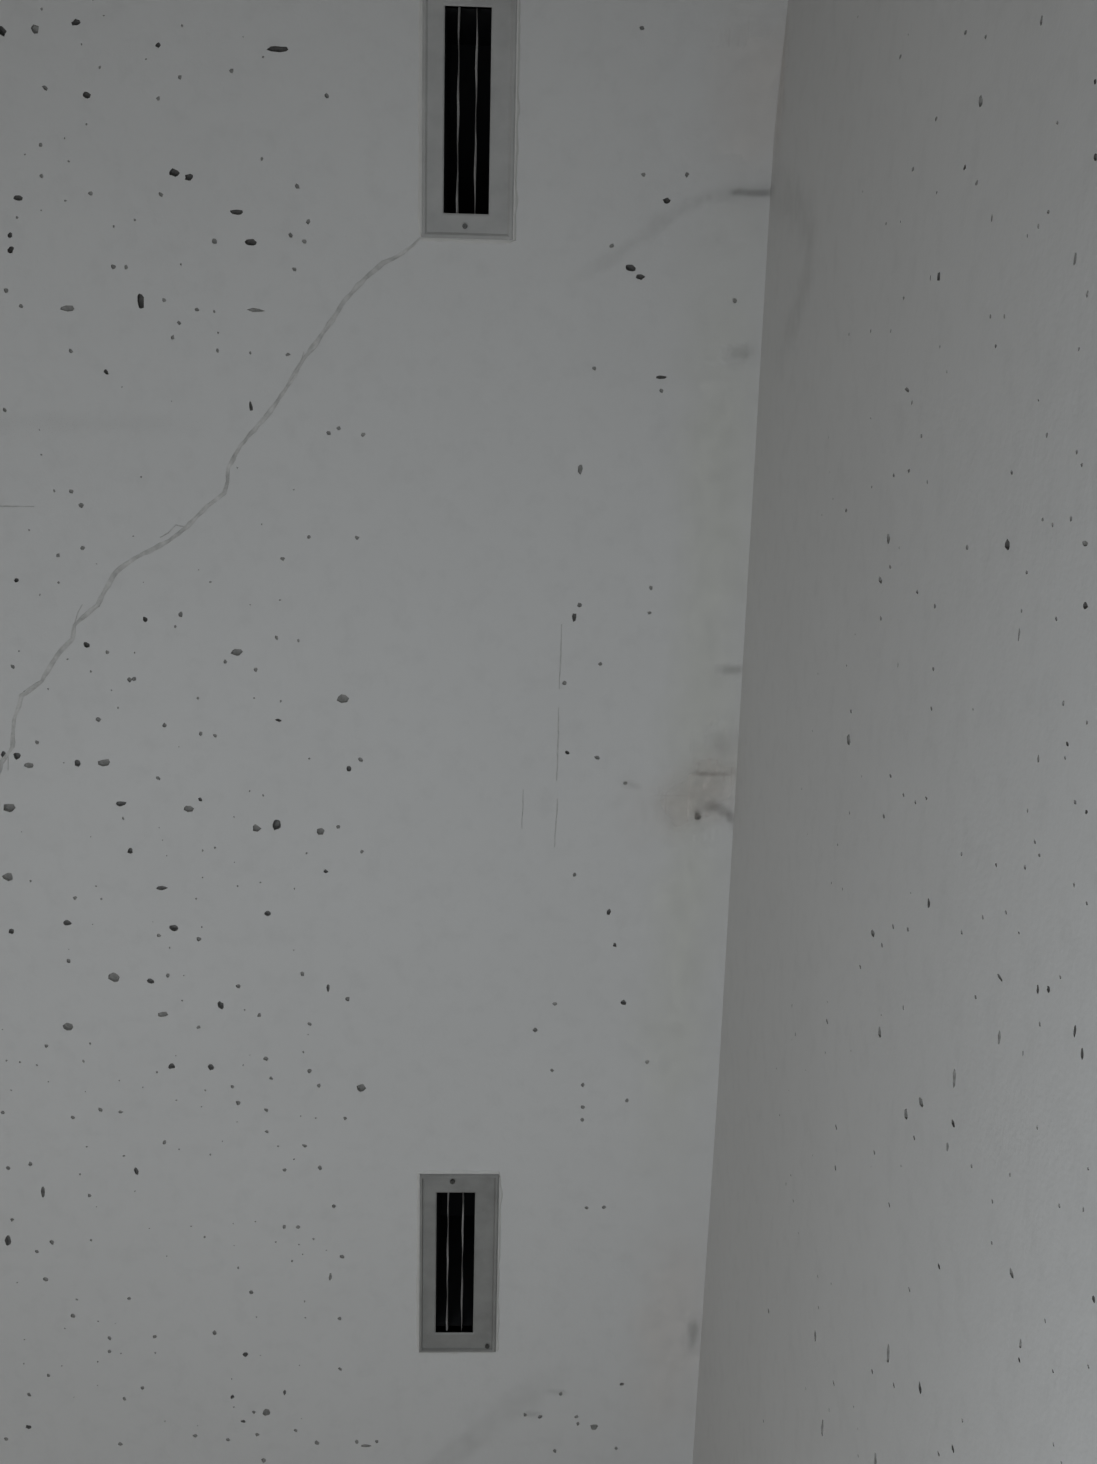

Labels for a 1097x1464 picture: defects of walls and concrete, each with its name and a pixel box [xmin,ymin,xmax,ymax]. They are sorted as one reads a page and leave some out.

crack [0,237,421,775]
crack [522,624,562,847]